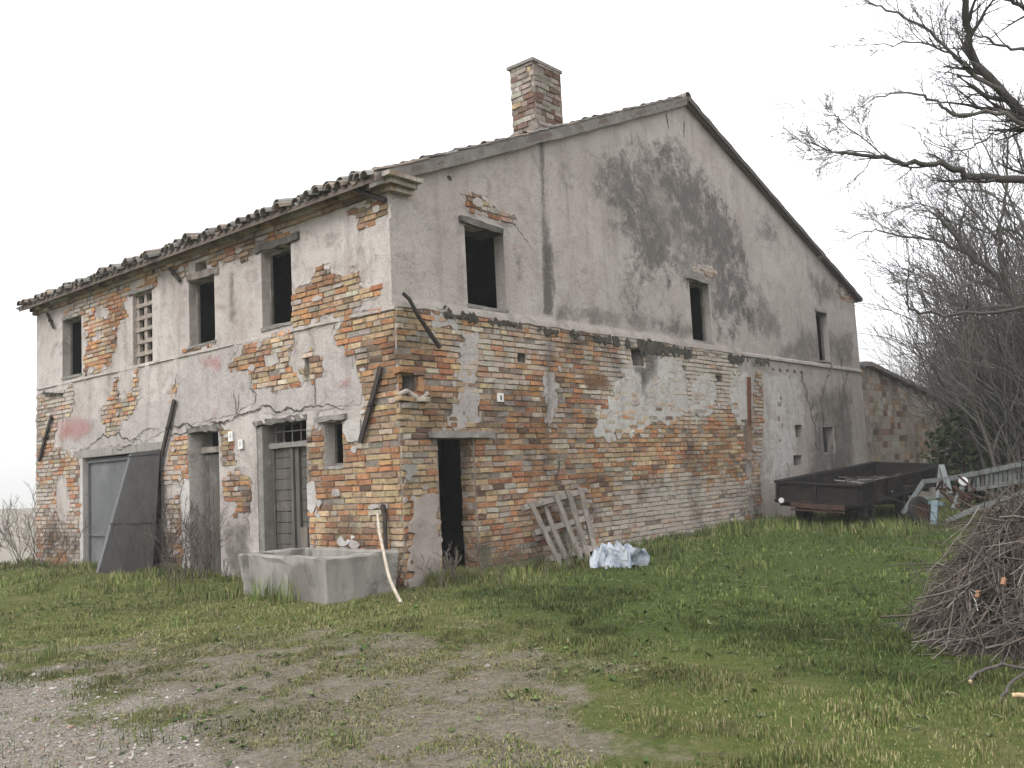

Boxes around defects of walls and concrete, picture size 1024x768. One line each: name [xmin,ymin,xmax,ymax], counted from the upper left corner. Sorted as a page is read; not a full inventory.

spalling [342,198,391,230]
spalling [460,189,518,227]
damp [543,215,554,312]
damp [597,148,751,334]
crack [81,380,354,451]
spalling [35,260,408,588]
peeling [429,304,482,431]
peeling [542,365,565,433]
peeling [593,355,805,521]